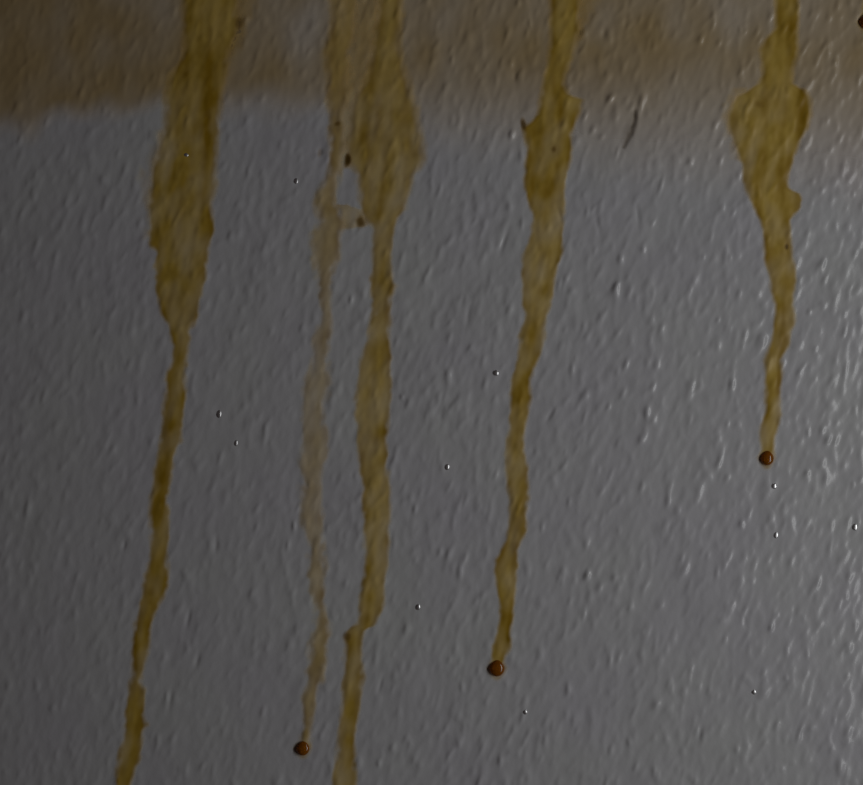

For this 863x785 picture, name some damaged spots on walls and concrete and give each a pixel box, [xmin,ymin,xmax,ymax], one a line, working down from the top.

water stain [0,0,425,785]
water stain [398,0,863,677]